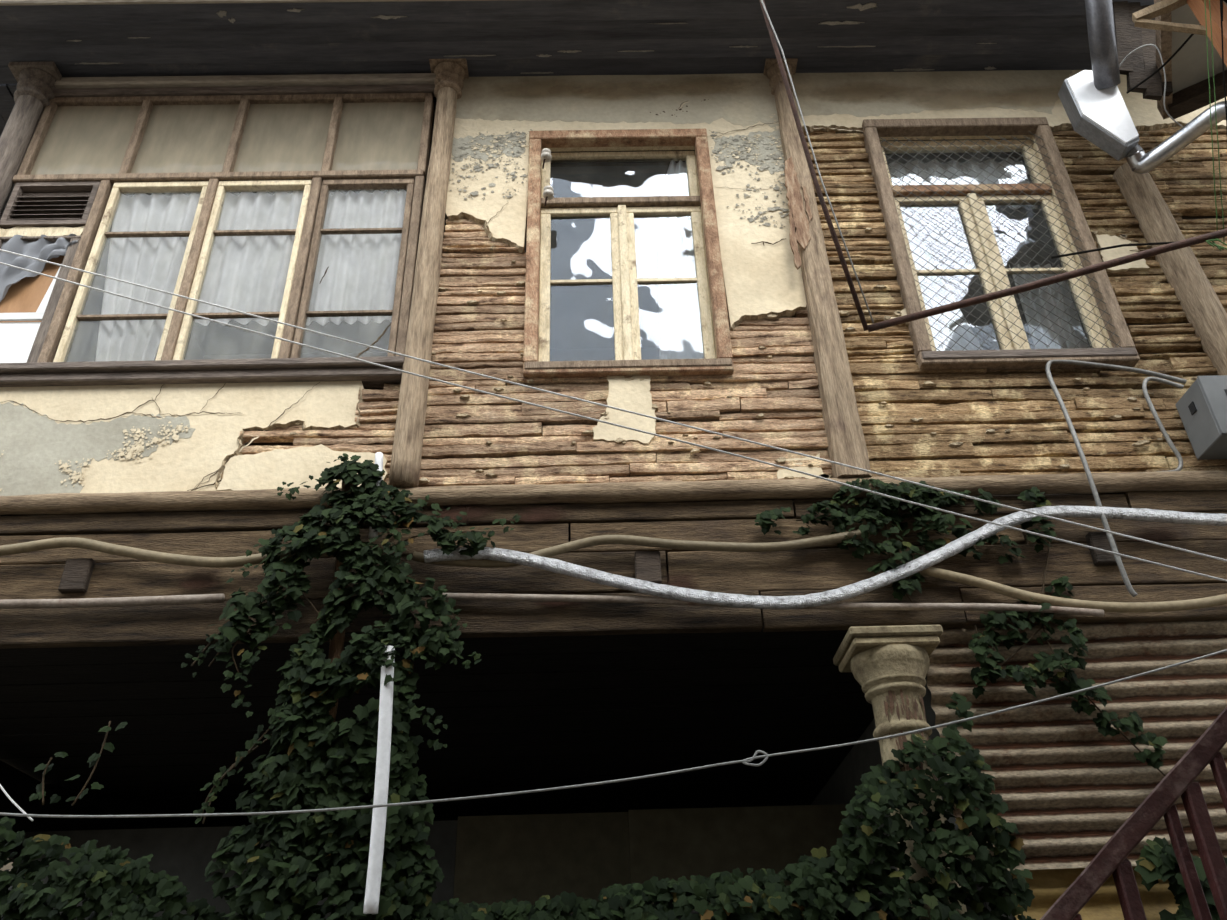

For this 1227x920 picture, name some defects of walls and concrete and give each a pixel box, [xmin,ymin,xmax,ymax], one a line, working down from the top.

spalling [418,129,833,487]
spalling [710,114,1227,478]
peeling [0,401,195,496]
crack [1,382,320,491]
spalling [215,384,401,489]